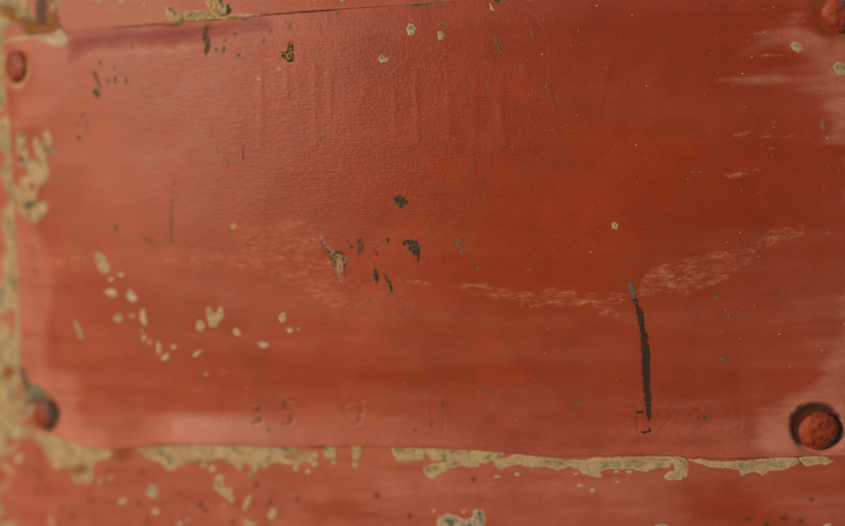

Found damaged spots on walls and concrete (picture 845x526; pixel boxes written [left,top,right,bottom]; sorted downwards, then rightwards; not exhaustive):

corrosion [0,6,60,36]
peeling [166,0,259,55]
peeling [0,0,128,492]
peeling [114,309,176,360]
peeling [196,305,224,331]
peeling [136,444,337,526]
peeling [390,447,833,492]
peeling [432,509,486,526]